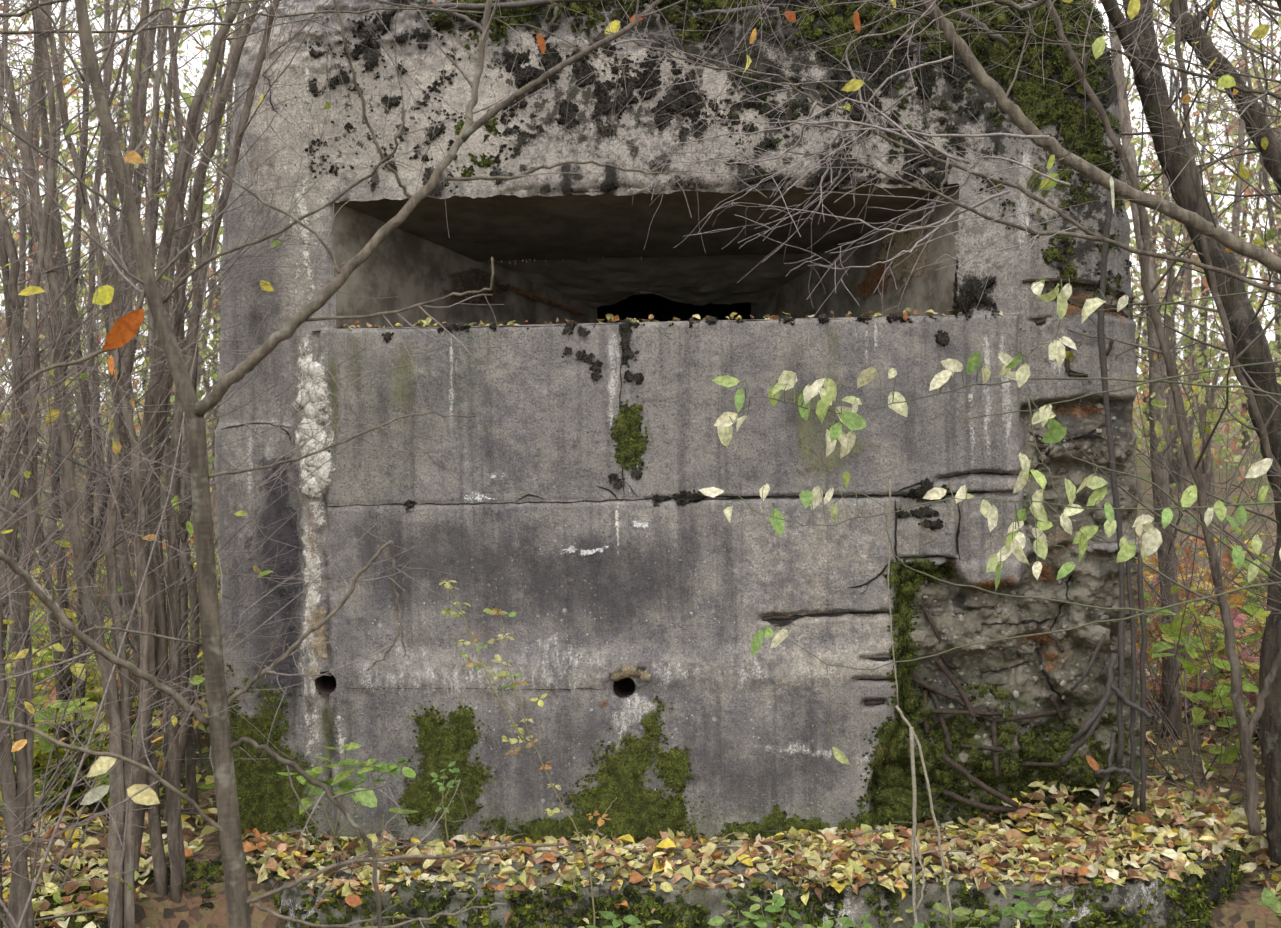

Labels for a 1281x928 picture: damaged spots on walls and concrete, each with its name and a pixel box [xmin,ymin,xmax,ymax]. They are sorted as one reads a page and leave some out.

water stain [296,340,332,438]
crack [617,338,625,414]
spalling [1064,339,1088,377]
water stain [298,469,346,772]
crack [324,420,1114,706]
spalling [864,398,1141,834]